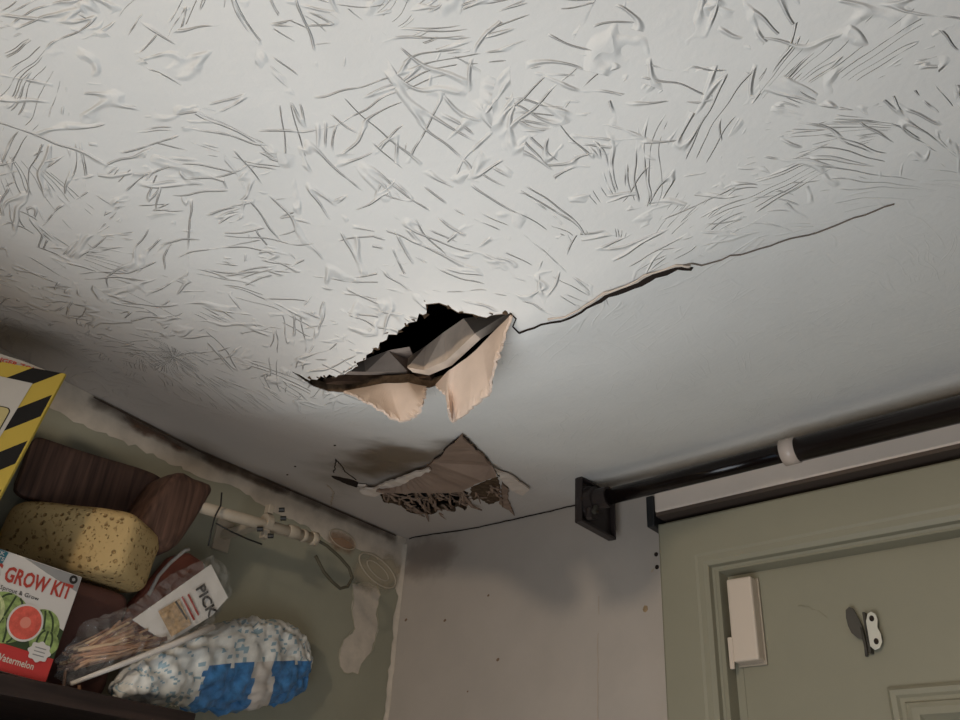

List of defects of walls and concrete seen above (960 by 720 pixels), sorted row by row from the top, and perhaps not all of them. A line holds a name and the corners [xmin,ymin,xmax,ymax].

crack [509,204,894,334]
spalling [293,303,512,392]
spalling [380,493,470,515]
peeling [339,582,381,675]